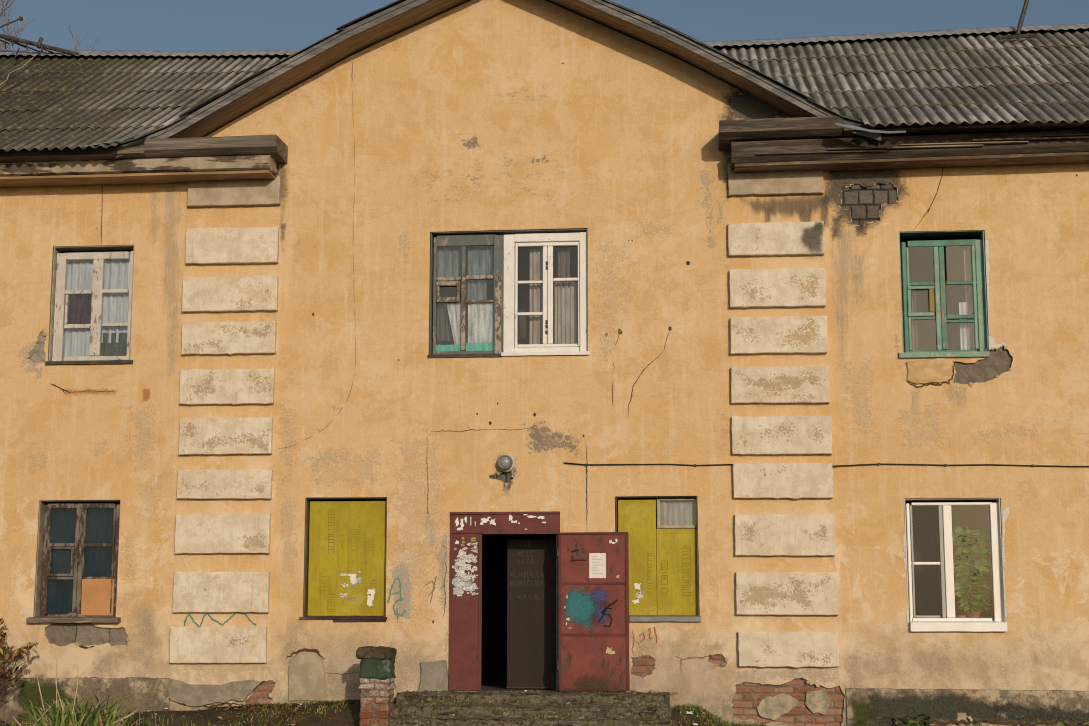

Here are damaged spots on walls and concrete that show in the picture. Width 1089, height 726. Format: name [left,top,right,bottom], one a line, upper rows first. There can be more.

leakage [751,193,843,237]
flaking render [839,180,898,226]
crack [913,168,943,231]
flaking render [953,239,1012,386]
crack [612,331,669,411]
flaking render [524,412,585,455]
flaking render [46,613,130,648]
flaking render [631,652,657,678]
flaking render [707,654,729,668]
flaking render [245,680,276,705]
flaking render [729,677,845,726]
leakage [853,693,1089,726]